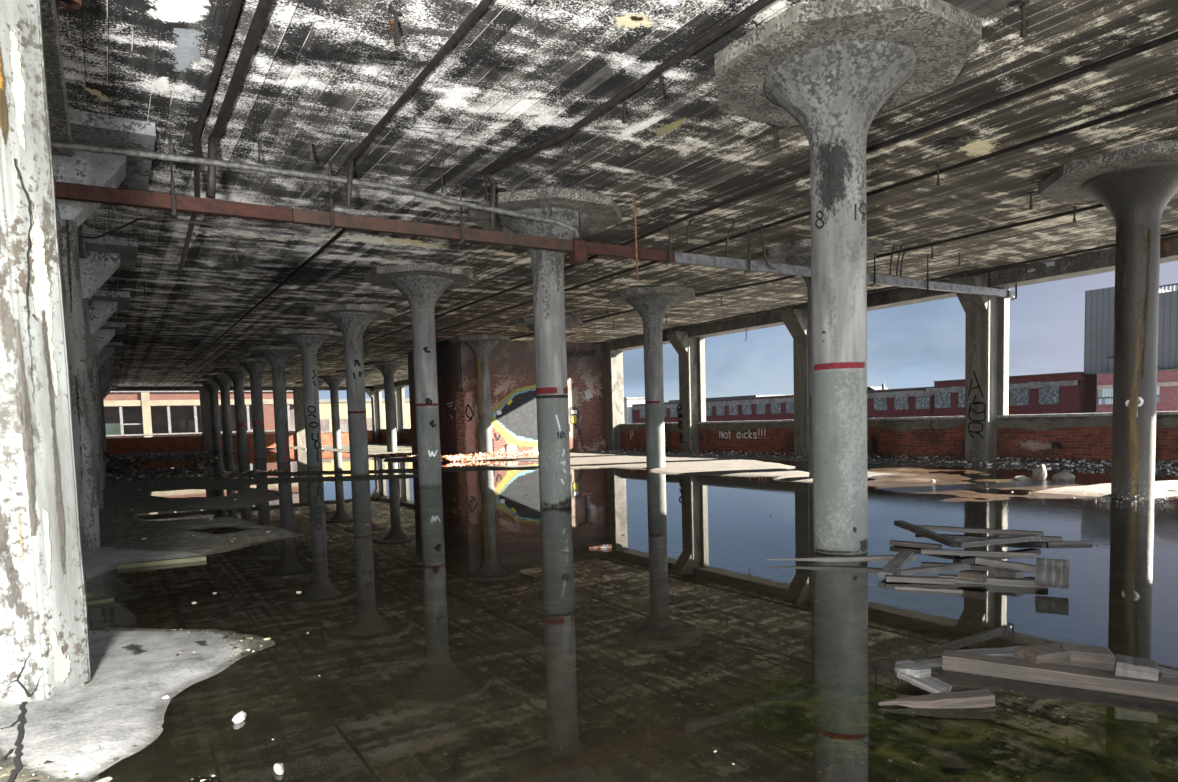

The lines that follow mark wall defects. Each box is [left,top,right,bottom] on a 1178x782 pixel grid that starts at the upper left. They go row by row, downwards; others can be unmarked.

peeling [9,29,26,150]
peeling [147,0,210,93]
leakage [617,113,687,138]
peeling [0,263,16,363]
peeling [30,213,66,587]
leakage [0,321,37,620]
peeling [49,627,71,683]
leakage [122,644,146,655]